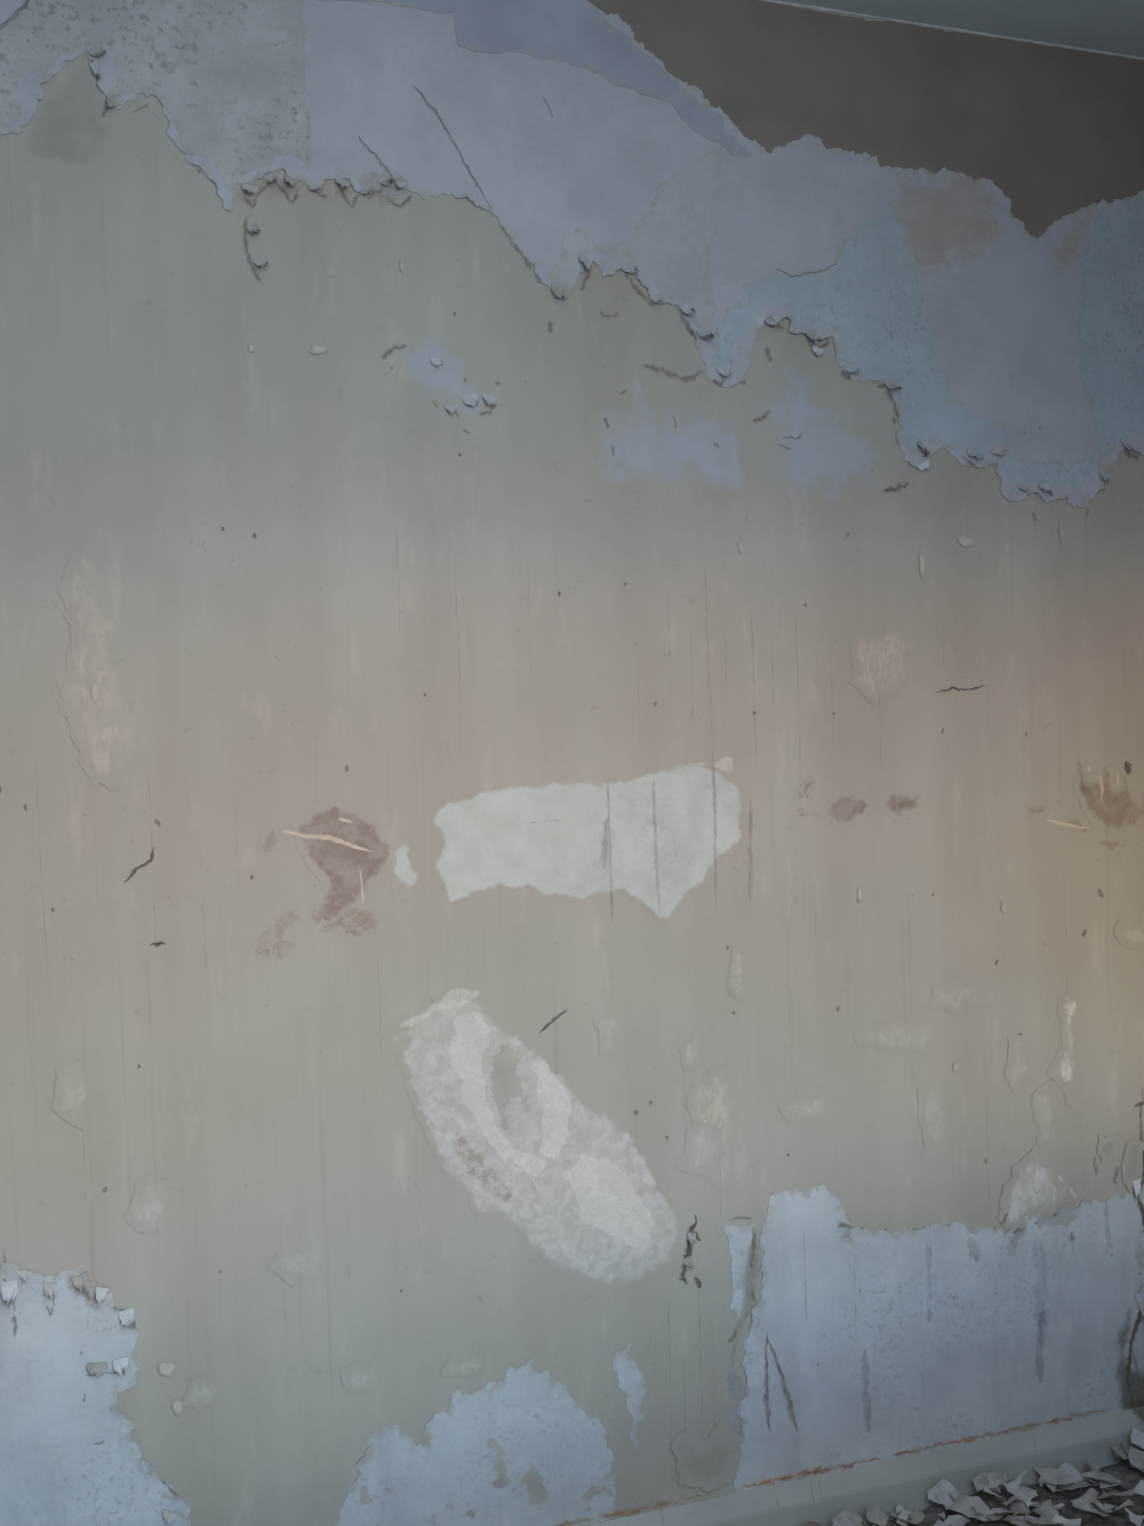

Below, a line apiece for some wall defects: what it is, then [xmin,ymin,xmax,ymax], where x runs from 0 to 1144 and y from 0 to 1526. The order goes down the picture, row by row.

peeling [0,0,1144,508]
leakage [256,800,397,928]
peeling [0,1262,191,1526]
peeling [334,1352,617,1526]
peeling [612,1342,646,1450]
peeling [724,1130,1144,1492]
crack [1125,1100,1144,1395]